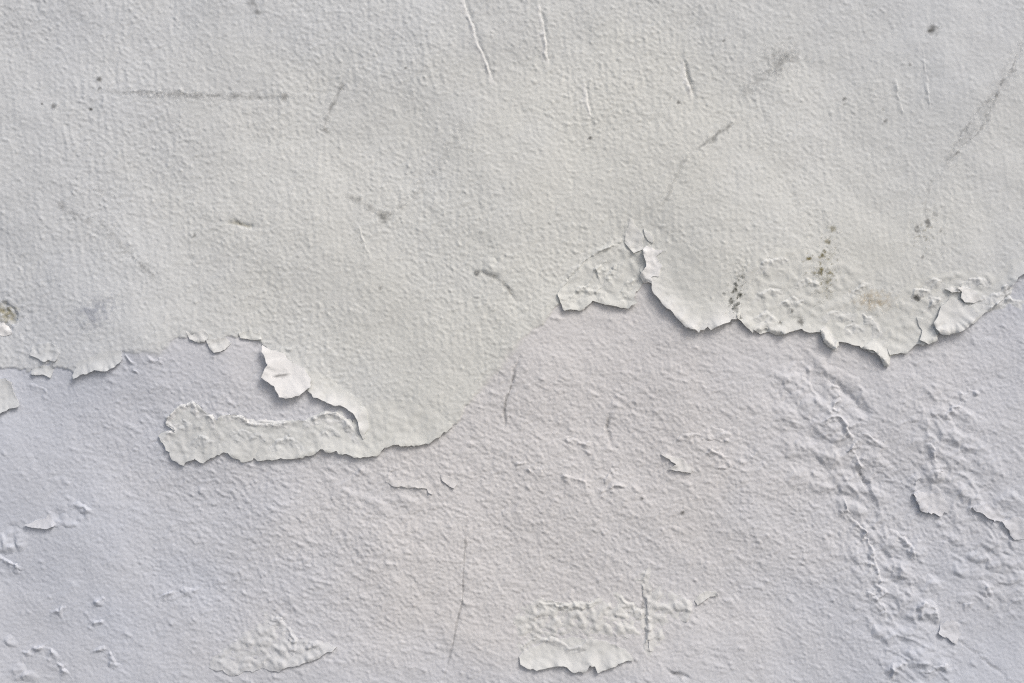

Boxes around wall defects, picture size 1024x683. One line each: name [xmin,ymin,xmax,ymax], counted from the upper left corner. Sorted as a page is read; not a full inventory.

peeling [553,218,1024,367]
spalling [0,308,12,336]
peeling [26,342,60,395]
peeling [72,350,167,380]
peeling [0,378,19,414]
peeling [158,330,453,515]
peeling [513,567,718,673]